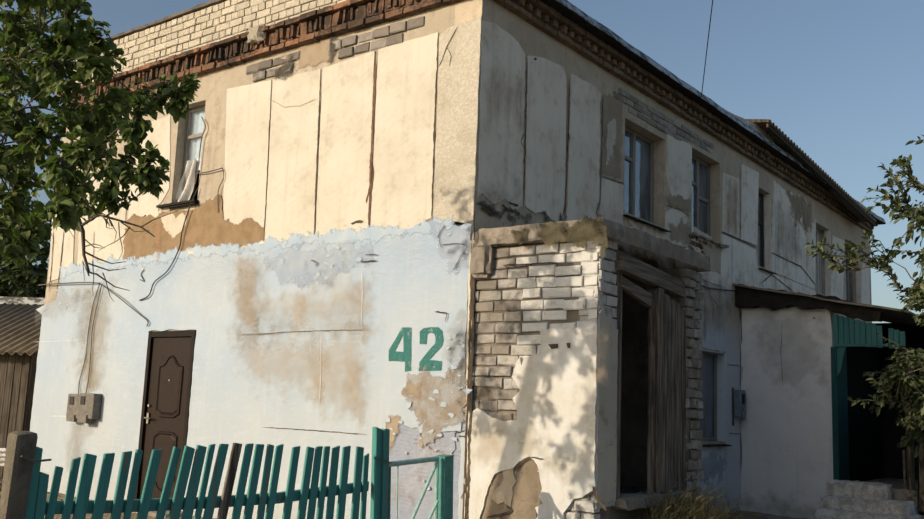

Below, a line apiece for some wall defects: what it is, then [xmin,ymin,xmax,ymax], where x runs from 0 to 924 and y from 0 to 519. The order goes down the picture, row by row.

crack [351,56,376,227]
flaking render [601,88,714,178]
peeling [123,194,265,260]
flaking render [386,332,472,519]
flaking render [482,457,542,519]